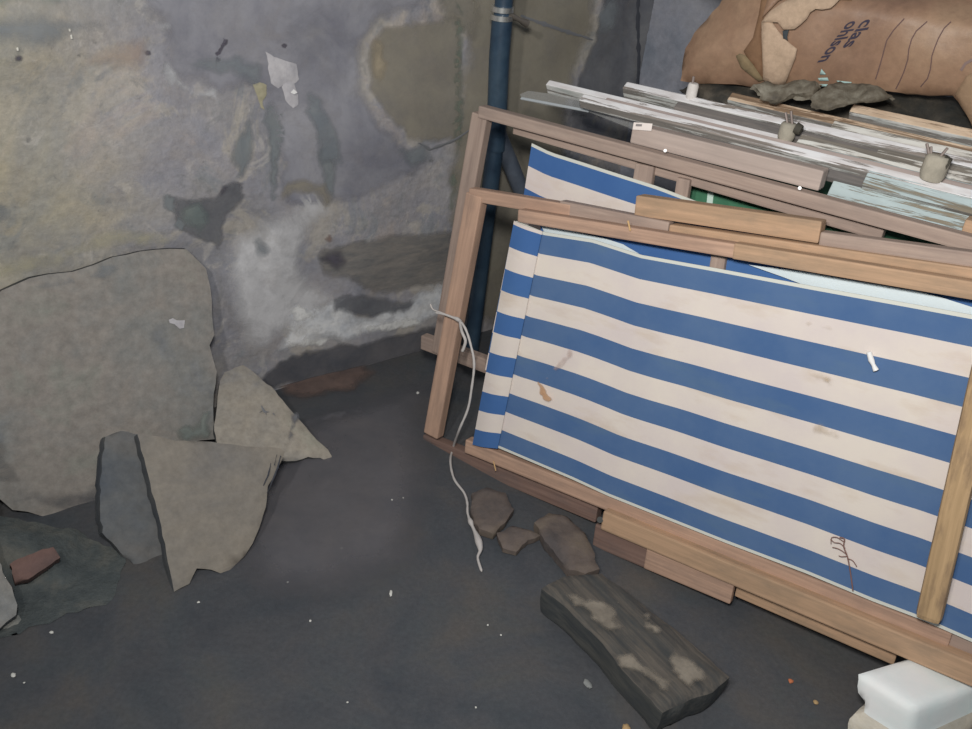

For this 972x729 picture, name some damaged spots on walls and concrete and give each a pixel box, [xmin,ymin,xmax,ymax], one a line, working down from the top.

spalling [164,183,242,246]
damp [149,0,451,387]